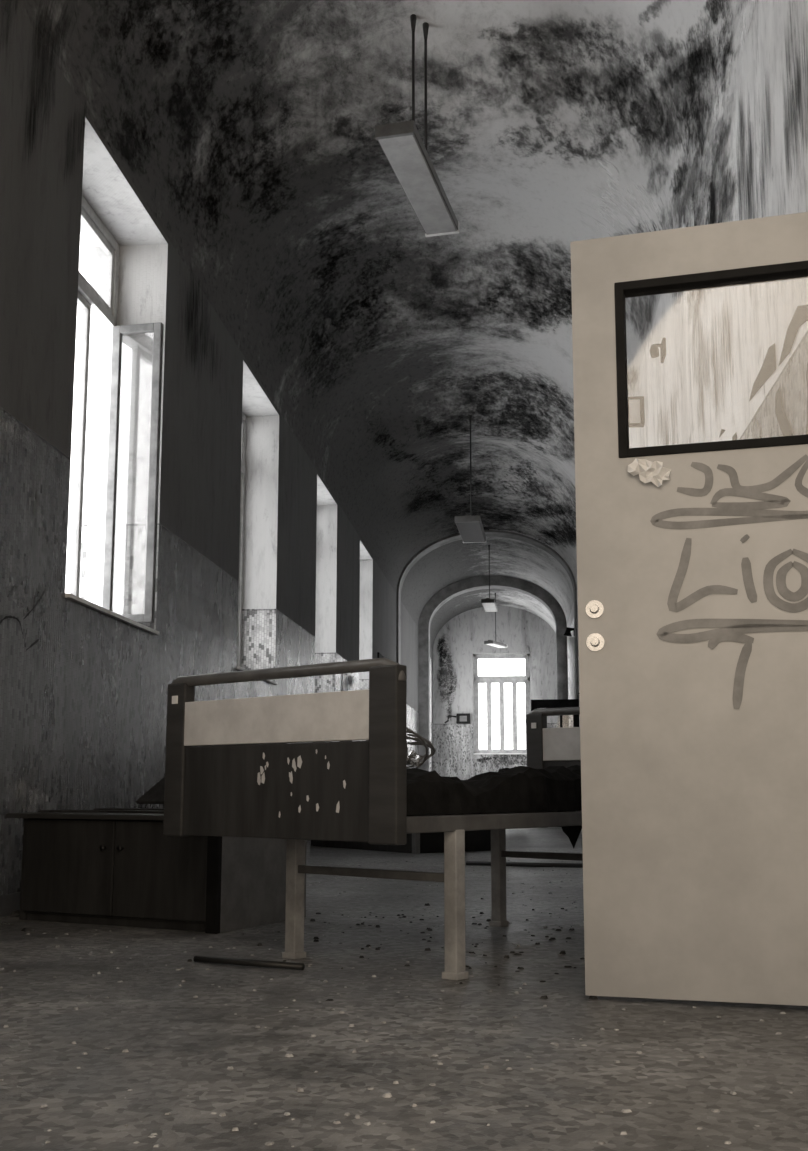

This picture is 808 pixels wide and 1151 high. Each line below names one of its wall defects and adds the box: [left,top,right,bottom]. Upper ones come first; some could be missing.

damp [106,0,293,241]
damp [421,61,460,89]
damp [481,0,770,227]
damp [784,12,805,168]
damp [269,222,399,396]
damp [445,243,572,338]
damp [626,295,654,332]
damp [376,373,576,545]